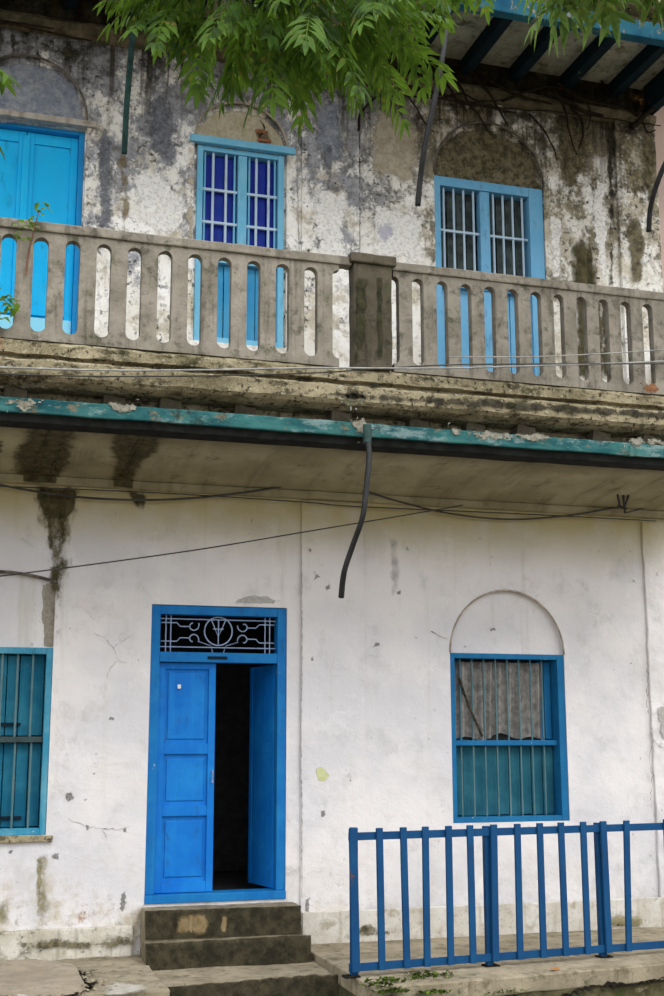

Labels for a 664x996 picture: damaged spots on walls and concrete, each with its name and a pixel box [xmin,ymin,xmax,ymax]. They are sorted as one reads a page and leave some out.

leakage [0,34,84,124]
leakage [87,129,141,228]
leakage [147,96,178,166]
leakage [434,129,550,190]
leakage [570,240,596,285]
peeling [5,398,44,412]
peeling [103,399,139,413]
spalling [338,383,379,443]
leakage [320,391,664,418]
leakage [111,434,159,507]
leakage [13,429,77,598]
flaking render [653,707,664,745]